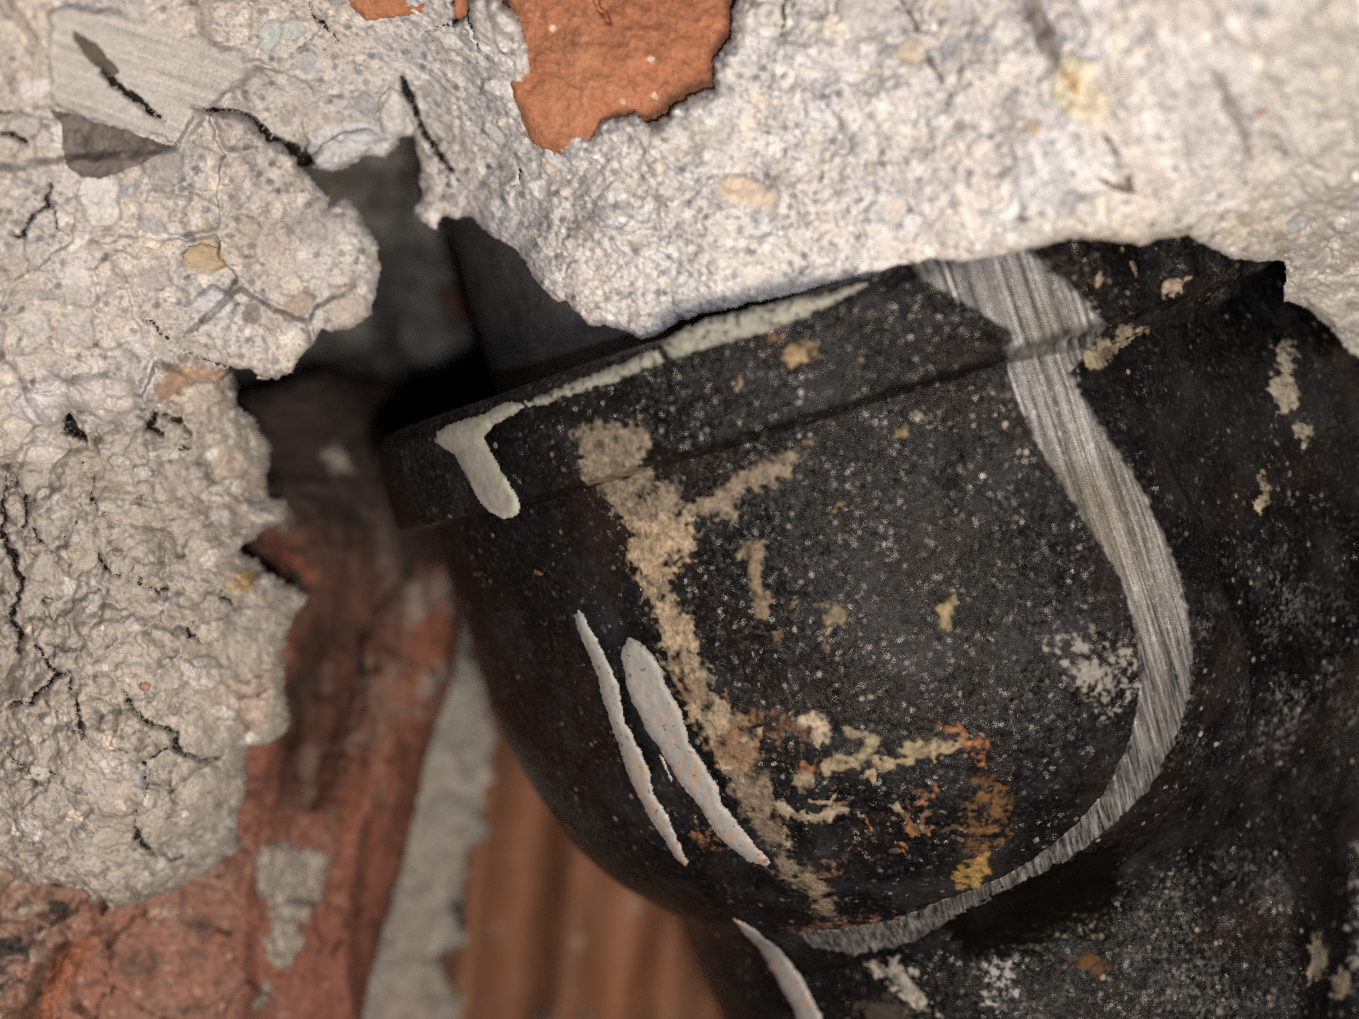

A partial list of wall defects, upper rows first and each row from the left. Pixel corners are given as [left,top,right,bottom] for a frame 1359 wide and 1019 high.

crack [146,410,192,451]
crack [0,413,170,743]
crack [186,620,201,644]
crack [123,689,222,861]